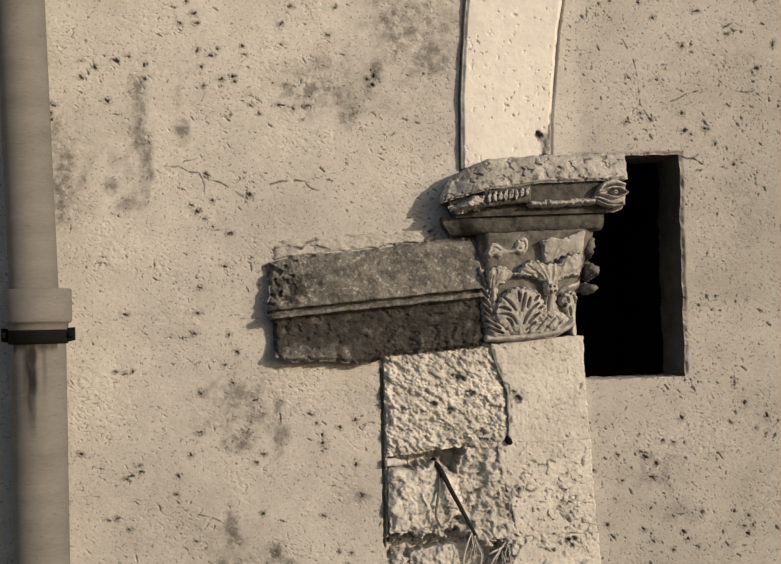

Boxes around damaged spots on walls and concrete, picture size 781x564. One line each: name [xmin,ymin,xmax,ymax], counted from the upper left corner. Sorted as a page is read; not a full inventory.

leakage [53,152,73,219]